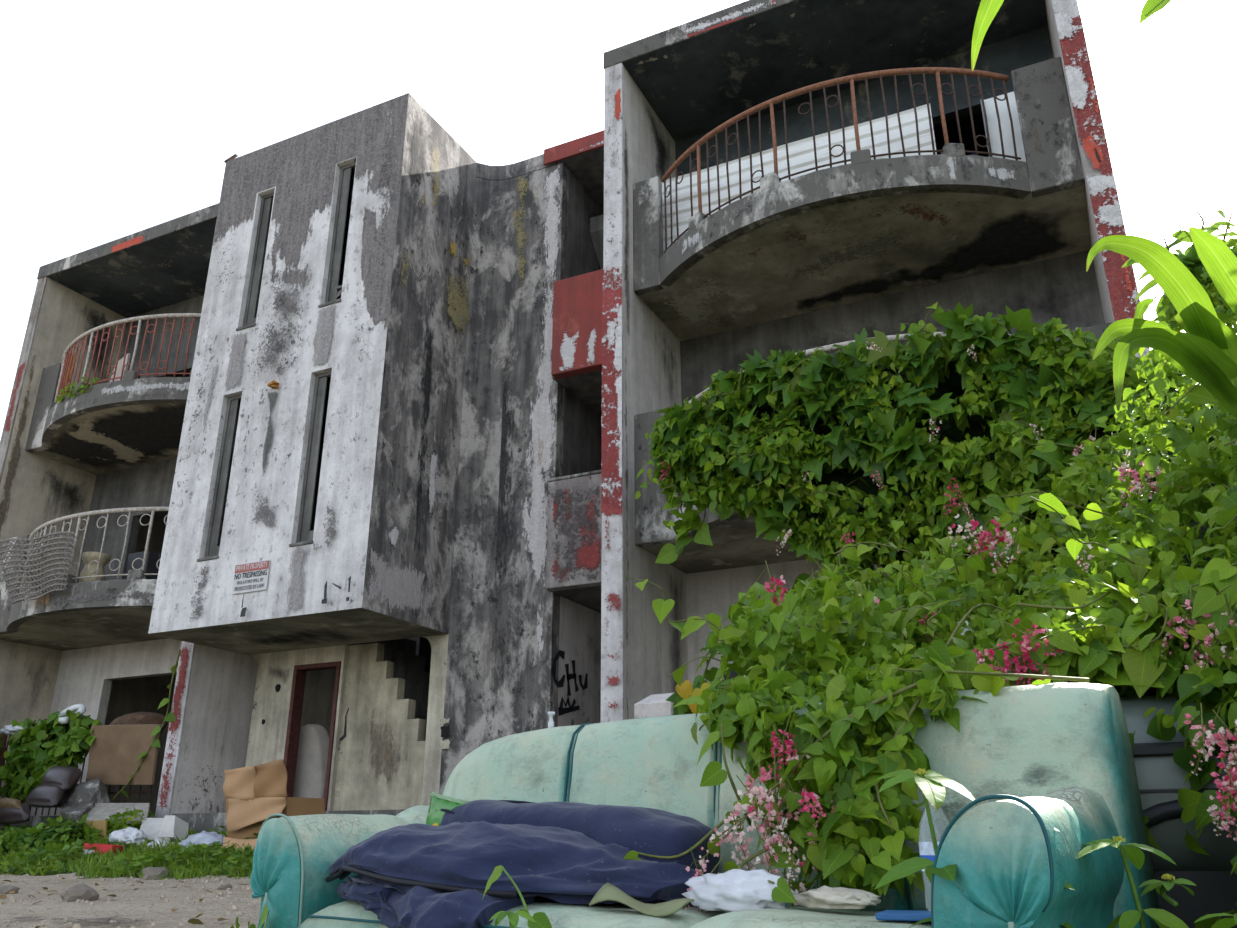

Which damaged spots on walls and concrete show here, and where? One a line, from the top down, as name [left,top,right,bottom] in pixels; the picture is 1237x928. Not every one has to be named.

water stain [374,113,424,266]
peeling [1053,1,1144,321]
water stain [253,494,279,527]
water stain [407,327,436,549]
water stain [495,360,519,585]
peeling [549,266,622,582]
peeling [155,715,180,809]
water stain [491,616,511,694]